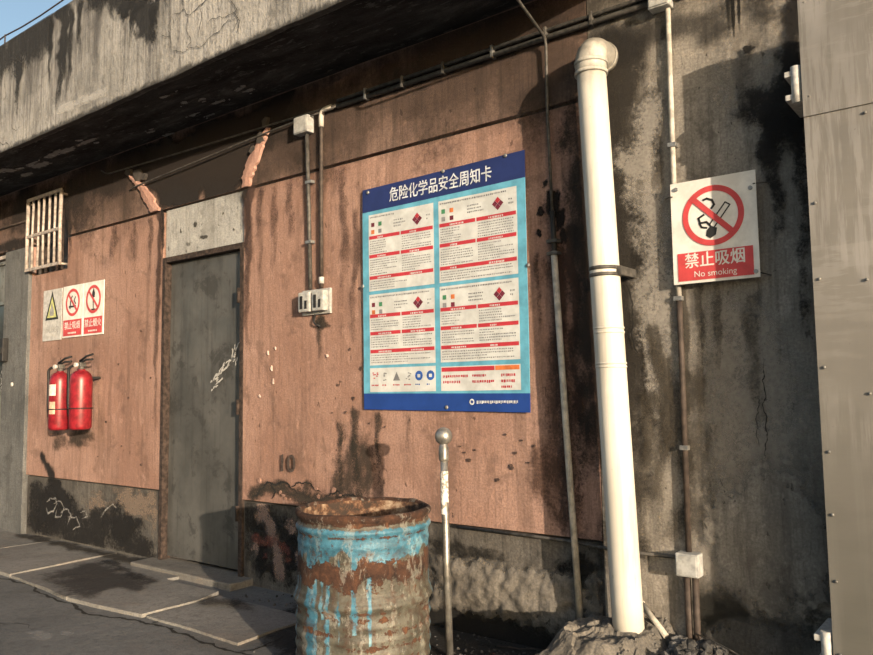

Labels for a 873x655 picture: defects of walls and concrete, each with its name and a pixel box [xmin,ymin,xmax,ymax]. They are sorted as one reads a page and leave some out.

damp [0,0,159,102]
crack [162,0,240,53]
damp [743,0,801,73]
flaking render [124,169,161,213]
flaking render [241,117,271,189]
damp [755,106,810,284]
damp [531,97,602,536]
damp [600,21,722,559]
crack [755,363,768,456]
damp [27,452,157,597]
flaking render [247,478,345,581]
crack [0,578,272,655]